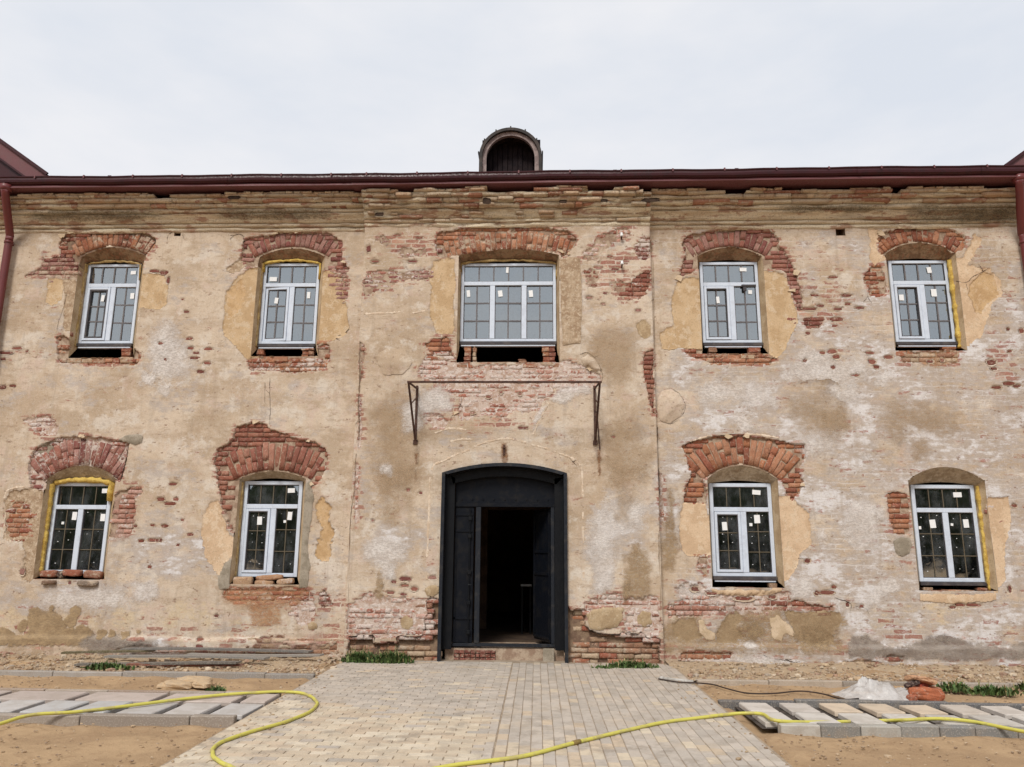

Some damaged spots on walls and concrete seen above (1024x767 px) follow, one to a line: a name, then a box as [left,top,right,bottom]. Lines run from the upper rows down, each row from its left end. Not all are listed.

spalling [25,228,156,366]
flaking render [222,232,350,374]
flaking render [363,224,1003,443]
damp [785,345,890,456]
damp [0,582,158,655]
spalling [3,416,335,582]
spalling [222,576,443,661]
spalling [564,433,865,664]
damp [790,577,815,597]
damp [663,585,1024,664]
damp [841,488,884,550]
damp [859,578,900,608]